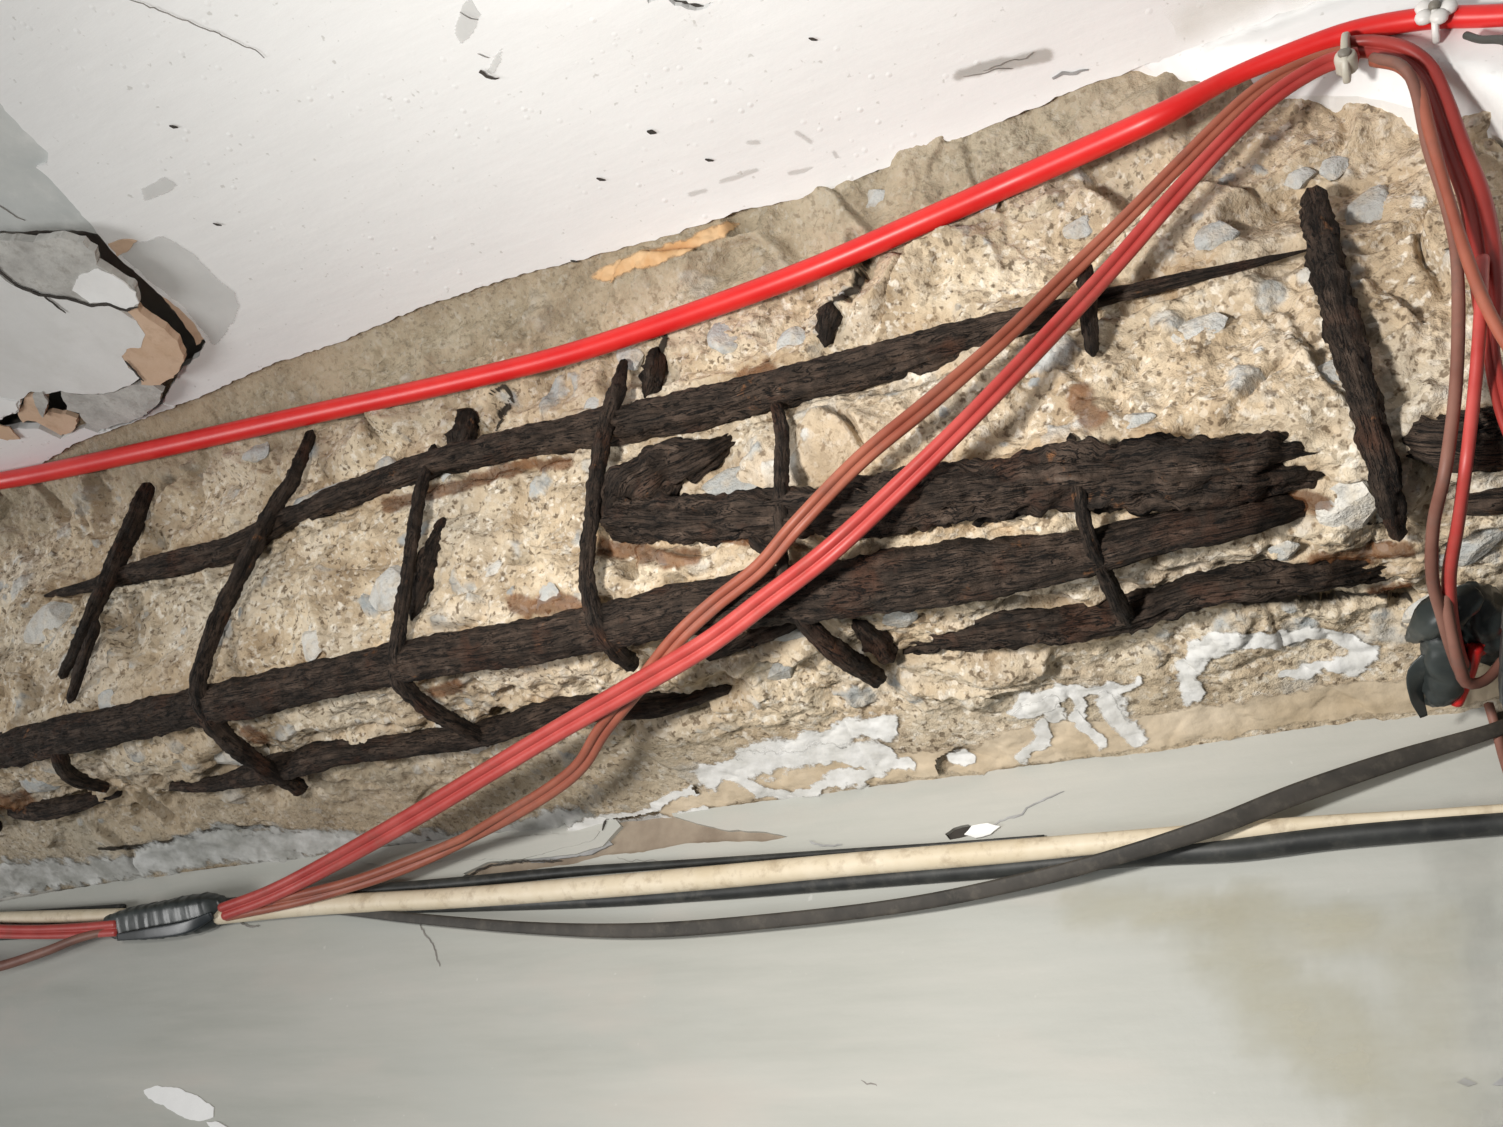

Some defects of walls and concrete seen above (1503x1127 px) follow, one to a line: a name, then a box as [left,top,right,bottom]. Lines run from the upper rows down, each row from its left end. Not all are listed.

peeling [964,52,1033,77]
rust [739,360,773,377]
rust [1068,384,1107,427]
rust [382,458,571,512]
spalling [0,71,1503,895]
rust [1287,491,1330,514]
rust [597,539,700,568]
rust [1309,542,1415,565]
rust [507,593,582,618]
rust [428,680,461,697]
rust [0,790,33,812]